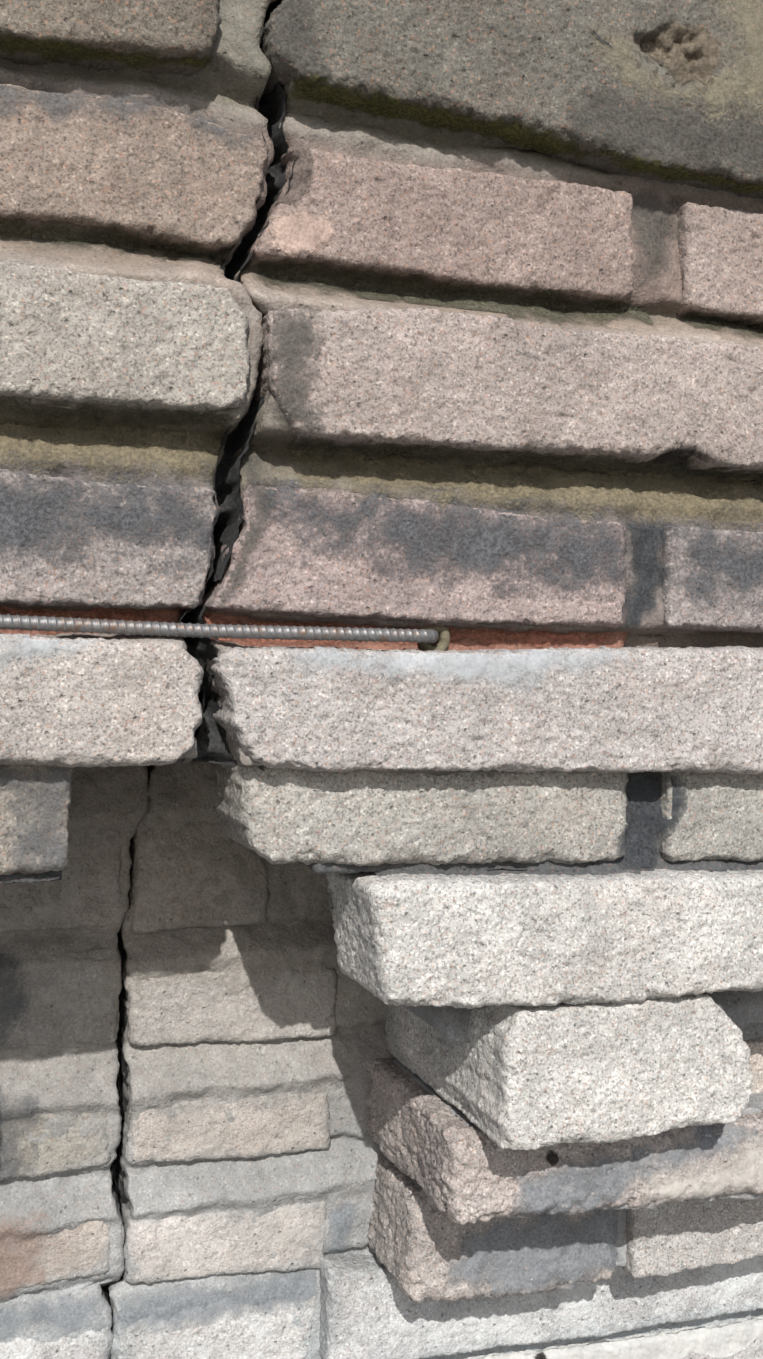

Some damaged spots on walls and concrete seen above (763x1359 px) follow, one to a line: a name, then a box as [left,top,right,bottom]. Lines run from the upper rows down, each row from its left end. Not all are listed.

crack [220,82,295,282]
rust [0,609,171,633]
crack [177,394,265,771]
rust [206,616,605,647]
crack [111,931,129,1211]
crack [101,1276,123,1318]